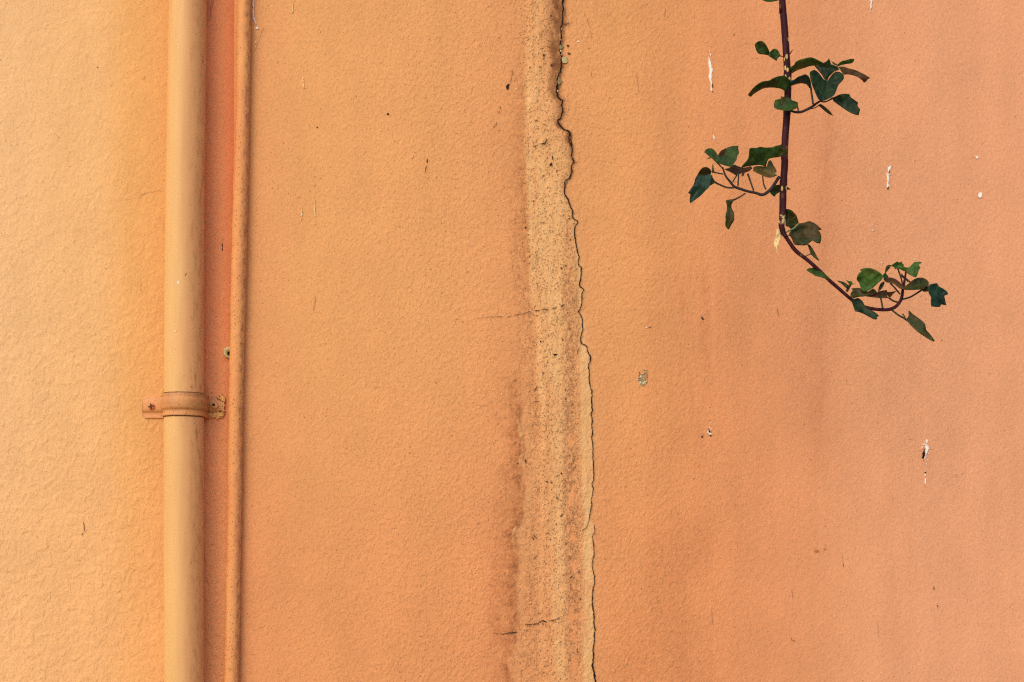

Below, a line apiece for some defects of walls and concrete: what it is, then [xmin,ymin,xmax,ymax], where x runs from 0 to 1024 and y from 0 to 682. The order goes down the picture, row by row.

crack [477,0,596,682]